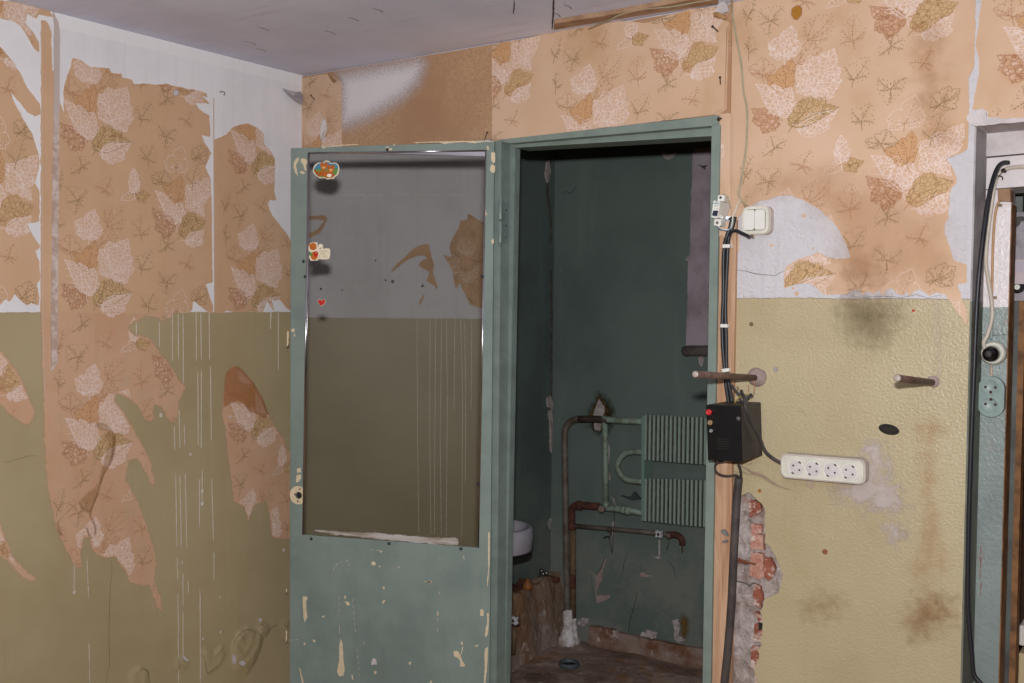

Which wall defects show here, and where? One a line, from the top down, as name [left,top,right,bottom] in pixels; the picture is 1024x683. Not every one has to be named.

peeling [282,88,303,104]
leakage [159,312,212,448]
spalling [590,394,614,432]
leakage [175,472,213,598]
flaking render [733,489,783,683]